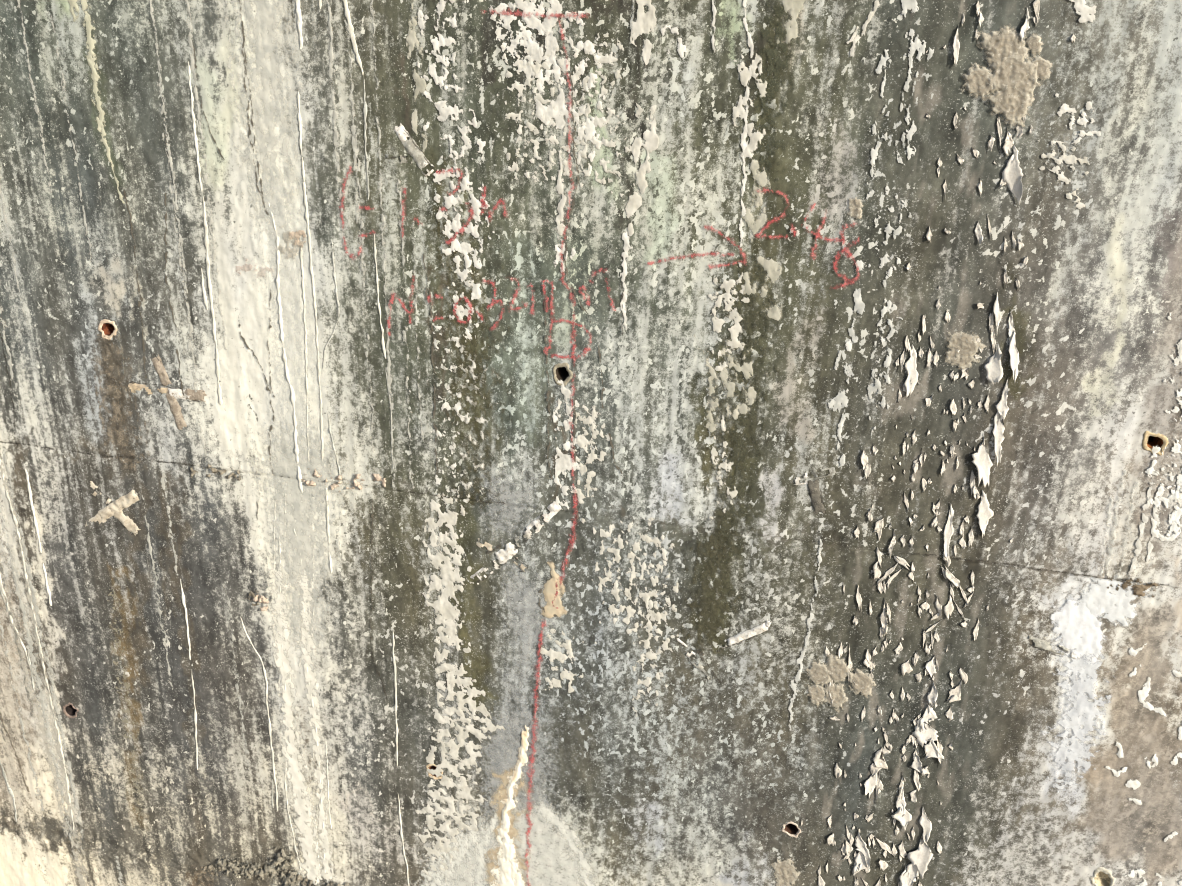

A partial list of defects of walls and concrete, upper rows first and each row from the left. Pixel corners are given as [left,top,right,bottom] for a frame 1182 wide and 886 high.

leakage [68,0,125,204]
leakage [223,0,424,886]
peeling [406,0,687,877]
peeling [703,256,782,520]
peeling [723,50,777,242]
leakage [697,0,807,563]
peeling [818,0,1028,886]
peeling [957,93,1101,209]
peeling [1019,0,1040,43]
leakage [0,454,87,886]
leakage [161,473,198,770]
leakage [398,564,596,886]